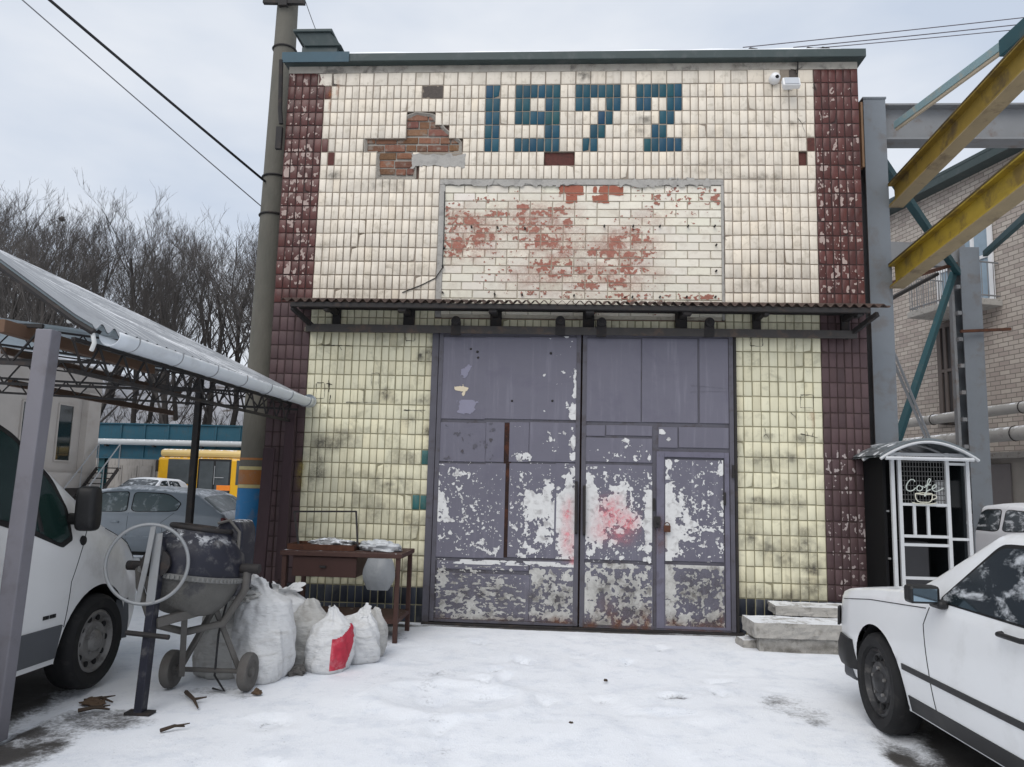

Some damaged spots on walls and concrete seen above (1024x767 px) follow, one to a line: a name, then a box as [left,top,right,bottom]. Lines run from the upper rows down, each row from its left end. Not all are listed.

spalling [278,74,338,287]
spalling [364,112,462,180]
peeling [444,185,720,302]
spalling [799,87,864,300]
peeling [412,364,652,627]
peeling [665,459,725,628]
spalling [825,449,863,497]
spalling [827,511,866,596]